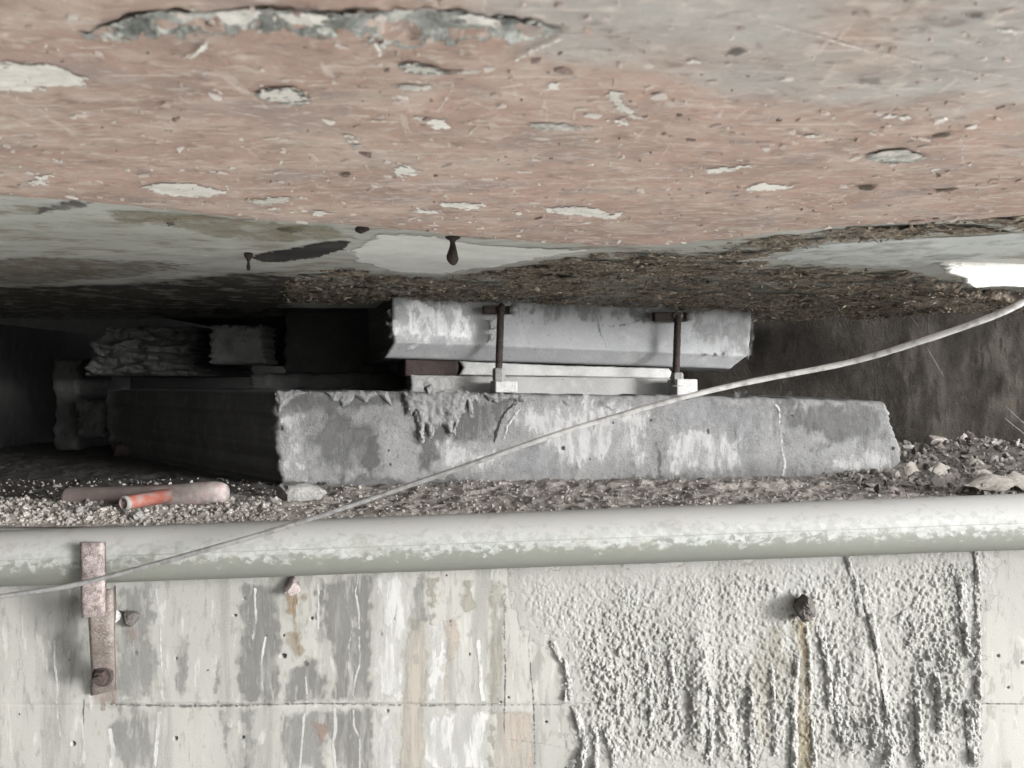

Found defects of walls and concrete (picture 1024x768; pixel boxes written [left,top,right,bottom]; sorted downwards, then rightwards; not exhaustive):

peeling [0,44,89,100]
peeling [120,83,242,216]
spalling [79,0,579,122]
peeling [245,124,633,243]
leakage [351,234,588,275]
peeling [643,85,691,121]
peeling [591,182,794,246]
peeling [710,93,971,225]
crack [494,403,521,442]
rust [797,621,810,768]